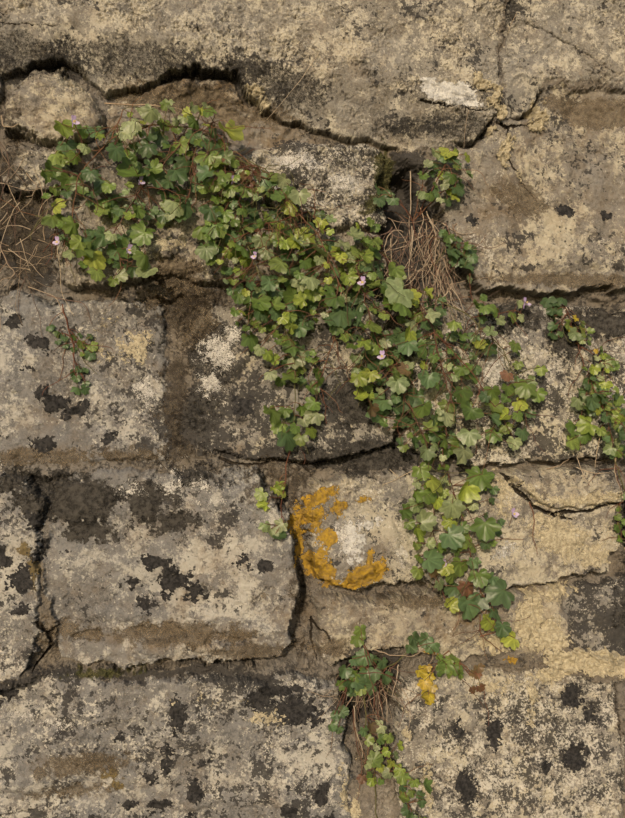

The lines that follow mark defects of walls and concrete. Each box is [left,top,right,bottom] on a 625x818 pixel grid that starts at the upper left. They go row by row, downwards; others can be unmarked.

crack [498,0,615,73]
crack [499,472,620,520]
crack [32,620,60,672]